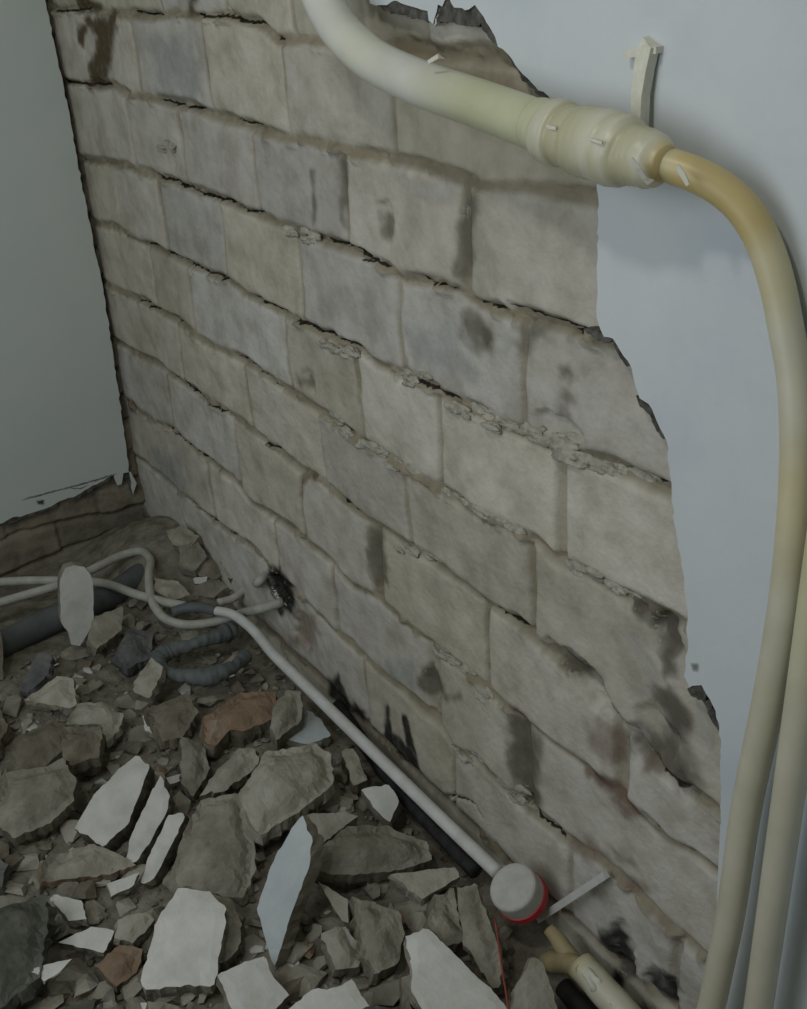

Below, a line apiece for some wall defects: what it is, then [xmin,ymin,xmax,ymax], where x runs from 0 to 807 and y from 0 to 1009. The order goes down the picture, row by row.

spalling [45,0,70,110]
spalling [346,0,549,98]
spalling [76,150,106,285]
spalling [584,326,613,343]
spalling [636,395,666,440]
spalling [0,309,150,578]
spalling [267,568,295,613]
spalling [687,685,709,702]
spalling [703,699,719,731]
spalling [361,785,402,828]
spalling [106,873,140,900]
spalling [54,894,115,958]